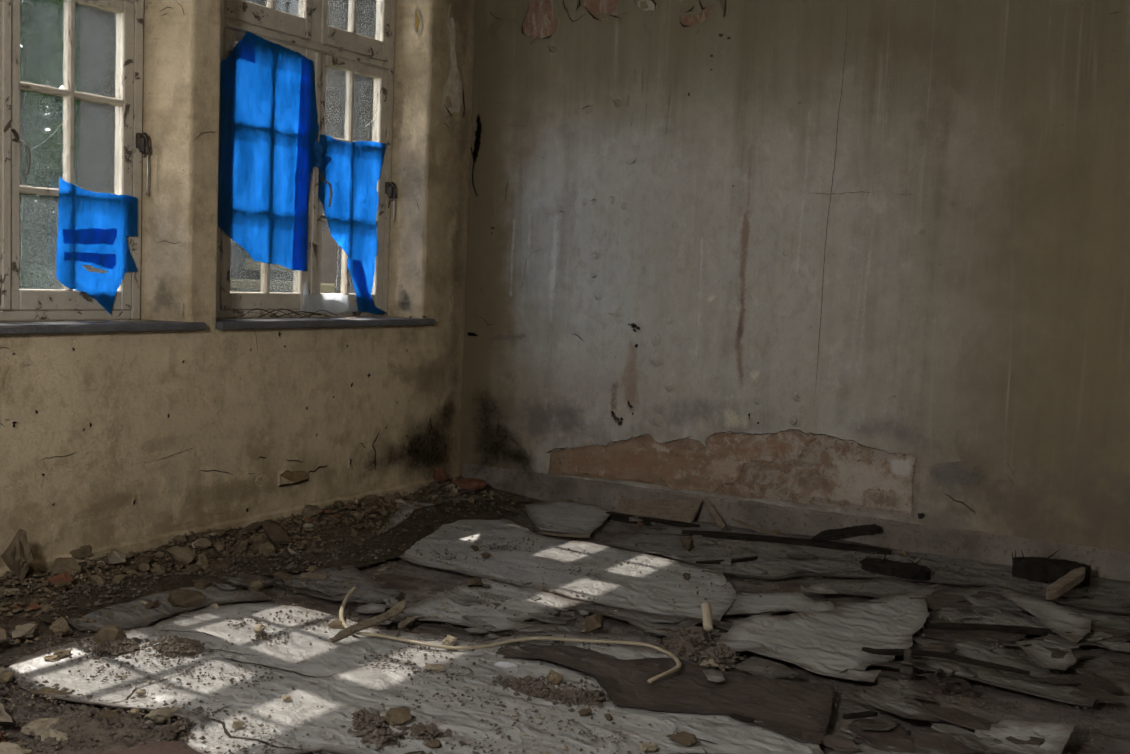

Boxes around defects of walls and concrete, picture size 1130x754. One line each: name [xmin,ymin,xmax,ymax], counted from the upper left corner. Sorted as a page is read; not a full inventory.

rust [732,143,755,398]
crack [814,10,909,401]
flaking render [544,411,928,521]